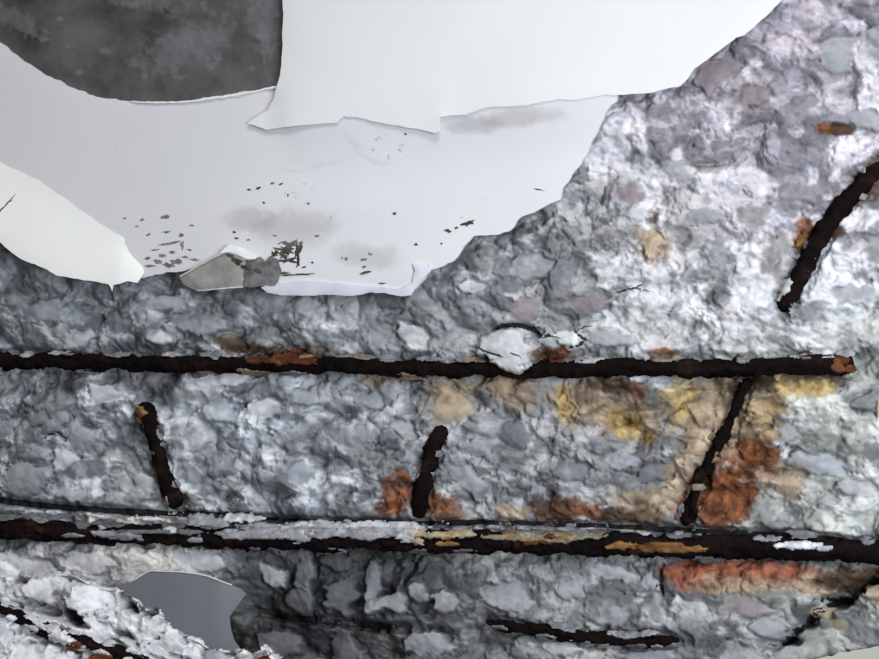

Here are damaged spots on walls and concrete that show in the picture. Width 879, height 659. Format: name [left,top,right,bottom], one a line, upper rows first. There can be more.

peeling [0,0,283,104]
peeling [0,162,144,291]
flaking render [179,238,314,291]
spalling [773,162,879,317]
corrosion [219,337,328,358]
corrosion [374,468,413,520]
spalling [0,349,857,527]
corrosion [424,371,536,411]
corrosion [649,347,679,358]
corrosion [496,373,848,530]
spalling [0,497,879,659]
corrosion [659,559,879,595]